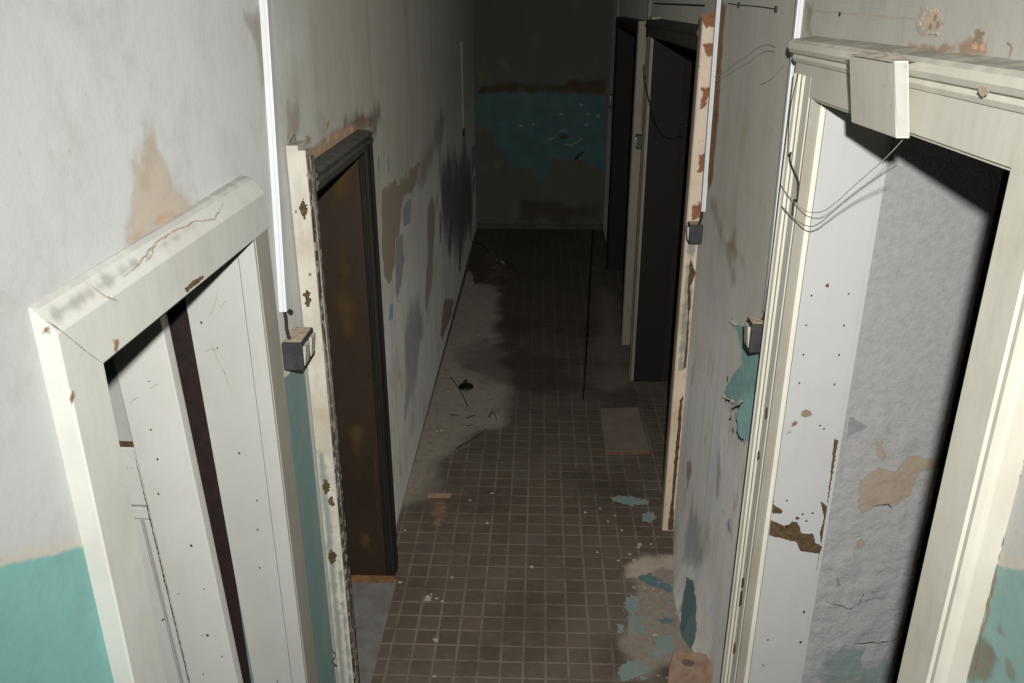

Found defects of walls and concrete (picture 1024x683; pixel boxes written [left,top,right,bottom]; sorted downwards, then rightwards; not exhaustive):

spalling [916,6,944,37]
spalling [973,28,985,46]
peeling [474,92,607,186]
crack [48,203,224,364]
spalling [376,152,420,321]
peeling [722,319,760,444]
peeling [769,417,868,569]
peeling [857,441,938,514]